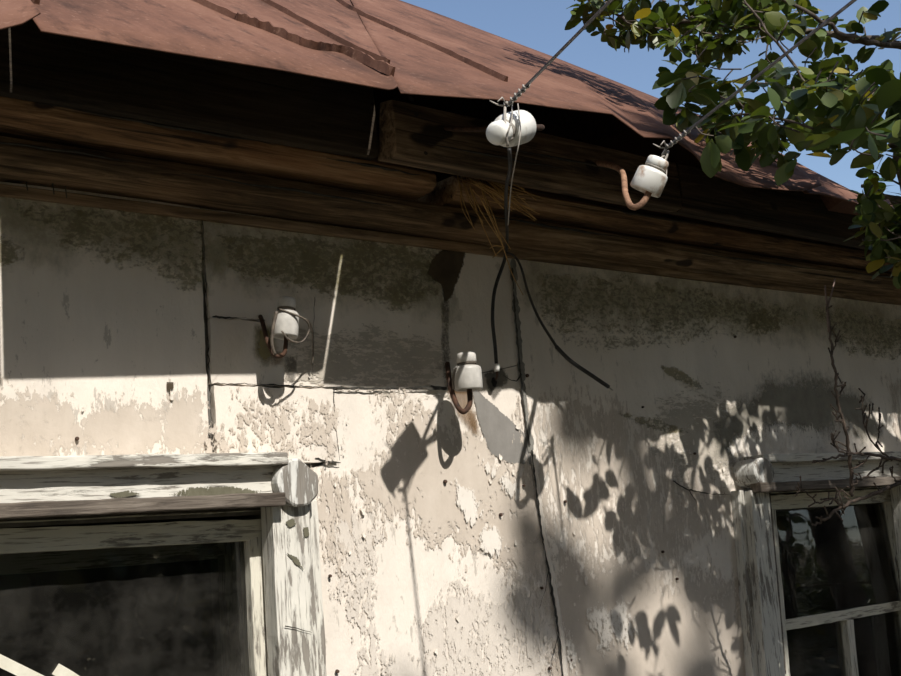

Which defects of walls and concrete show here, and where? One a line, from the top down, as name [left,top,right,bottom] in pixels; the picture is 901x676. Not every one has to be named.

damp [0,197,204,291]
crack [202,220,447,463]
damp [218,232,465,378]
damp [542,275,901,360]
peeling [0,321,748,676]
crack [503,259,564,676]
damp [715,377,879,465]